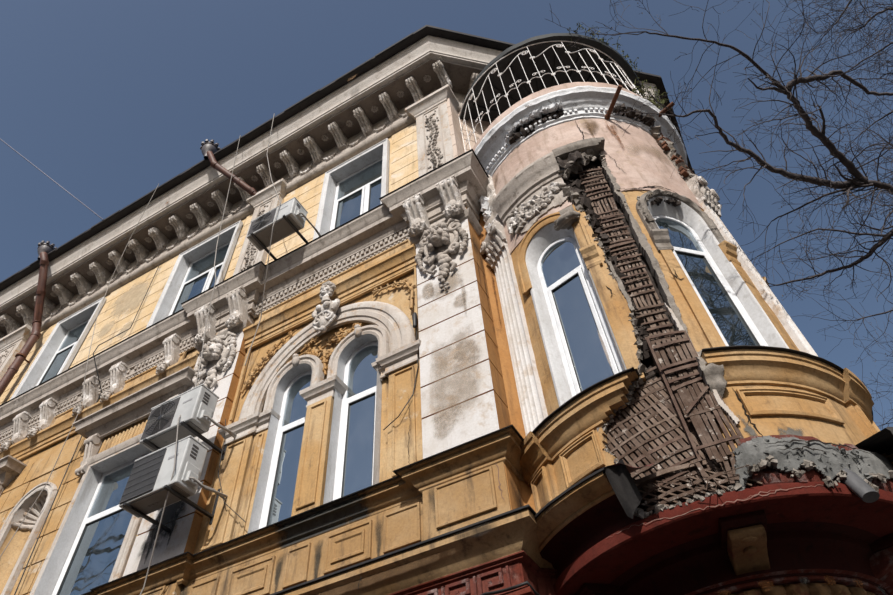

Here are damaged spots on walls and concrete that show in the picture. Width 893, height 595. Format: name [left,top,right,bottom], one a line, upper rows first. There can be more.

spalling [613,103,696,181]
spalling [556,148,778,519]
peeling [790,459,816,478]
peeling [822,470,847,488]
peeling [864,470,893,493]
leakage [141,500,185,561]
leakage [275,493,370,578]